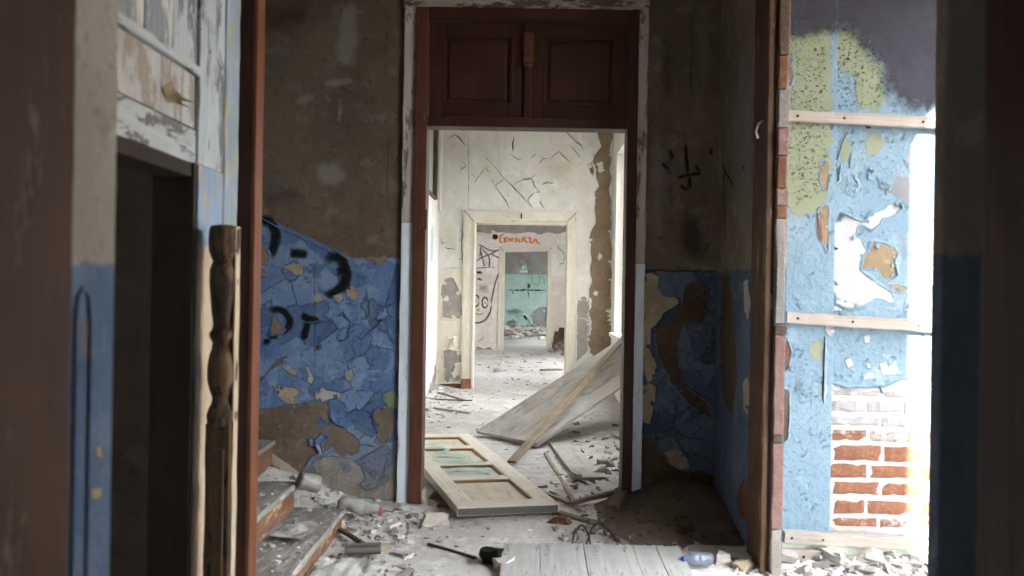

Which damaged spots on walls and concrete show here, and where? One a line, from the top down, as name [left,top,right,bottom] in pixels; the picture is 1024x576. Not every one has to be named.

peeling [162,81,194,107]
peeling [269,315,286,336]
peeling [261,241,305,277]
peeling [258,329,400,501]
peeling [311,284,363,305]
crack [440,132,583,269]
peeling [504,133,614,364]
peeling [641,271,751,487]
peeling [785,336,794,371]
peeling [809,326,835,361]
peeling [788,19,932,320]
spalling [830,356,930,538]